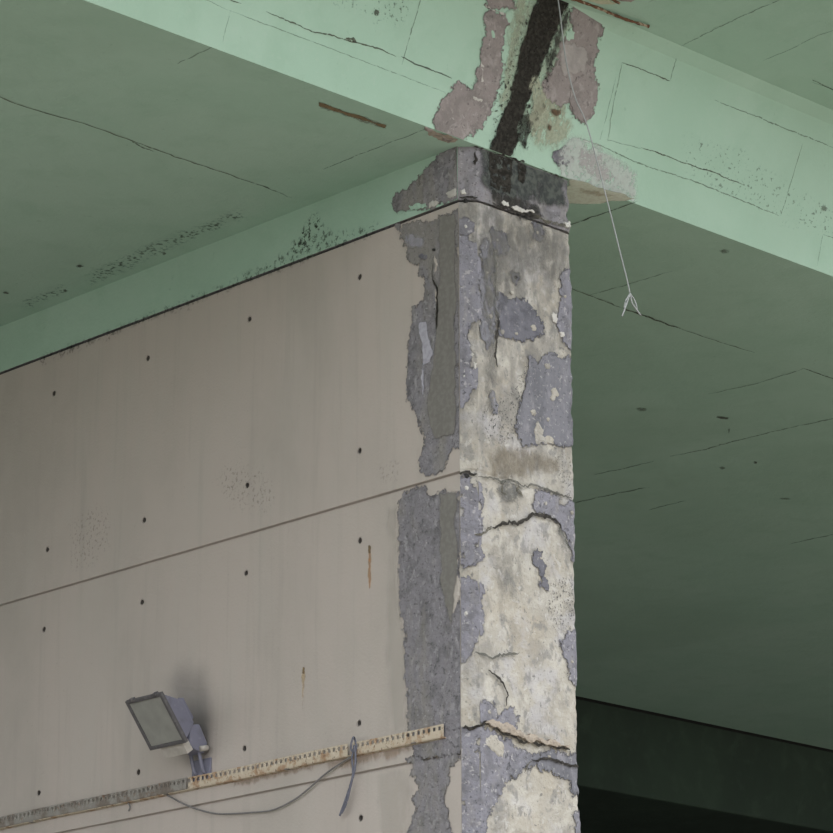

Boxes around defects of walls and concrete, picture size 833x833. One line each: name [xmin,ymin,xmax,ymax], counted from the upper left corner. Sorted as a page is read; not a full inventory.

peeling [542,0,650,125]
crack [1,97,291,198]
rust [319,102,386,128]
water stain [481,0,637,219]
peeling [567,179,633,204]
crack [643,148,743,185]
water stain [237,220,347,284]
crack [573,289,752,352]
peeling [391,0,579,833]
crack [459,470,572,549]
crack [463,652,579,773]
peeling [573,810,581,833]